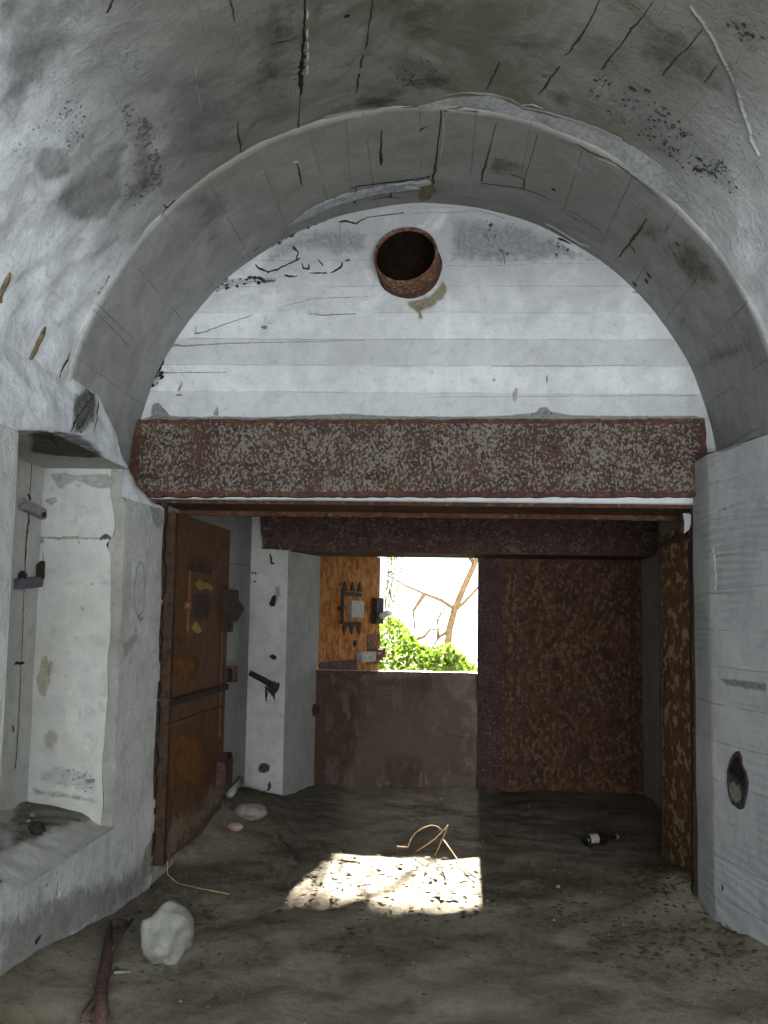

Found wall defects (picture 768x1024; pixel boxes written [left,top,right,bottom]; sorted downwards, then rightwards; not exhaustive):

crack [601,1,654,70]
crack [661,29,703,76]
crack [252,0,551,316]
spalling [272,180,432,247]
corrosion [408,283,446,319]
spalling [73,390,96,433]
spalling [727,751,749,810]